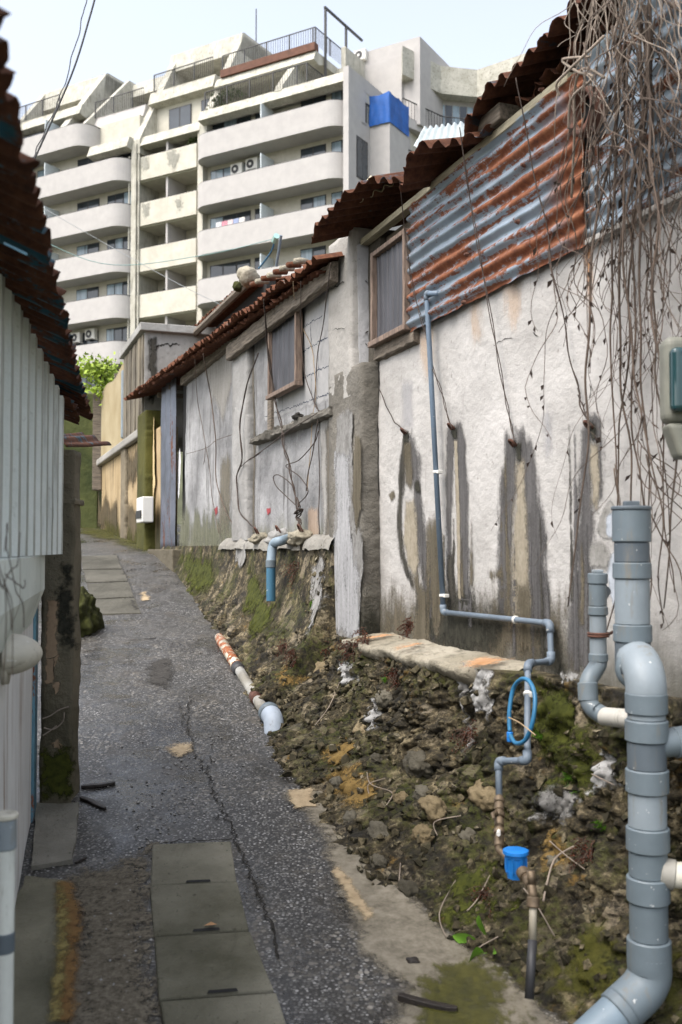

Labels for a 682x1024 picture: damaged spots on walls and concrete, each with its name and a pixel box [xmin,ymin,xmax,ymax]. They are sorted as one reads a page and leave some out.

peeling [44,600,60,695]
peeling [308,408,363,638]
damp [361,414,602,683]
crack [161,696,279,959]